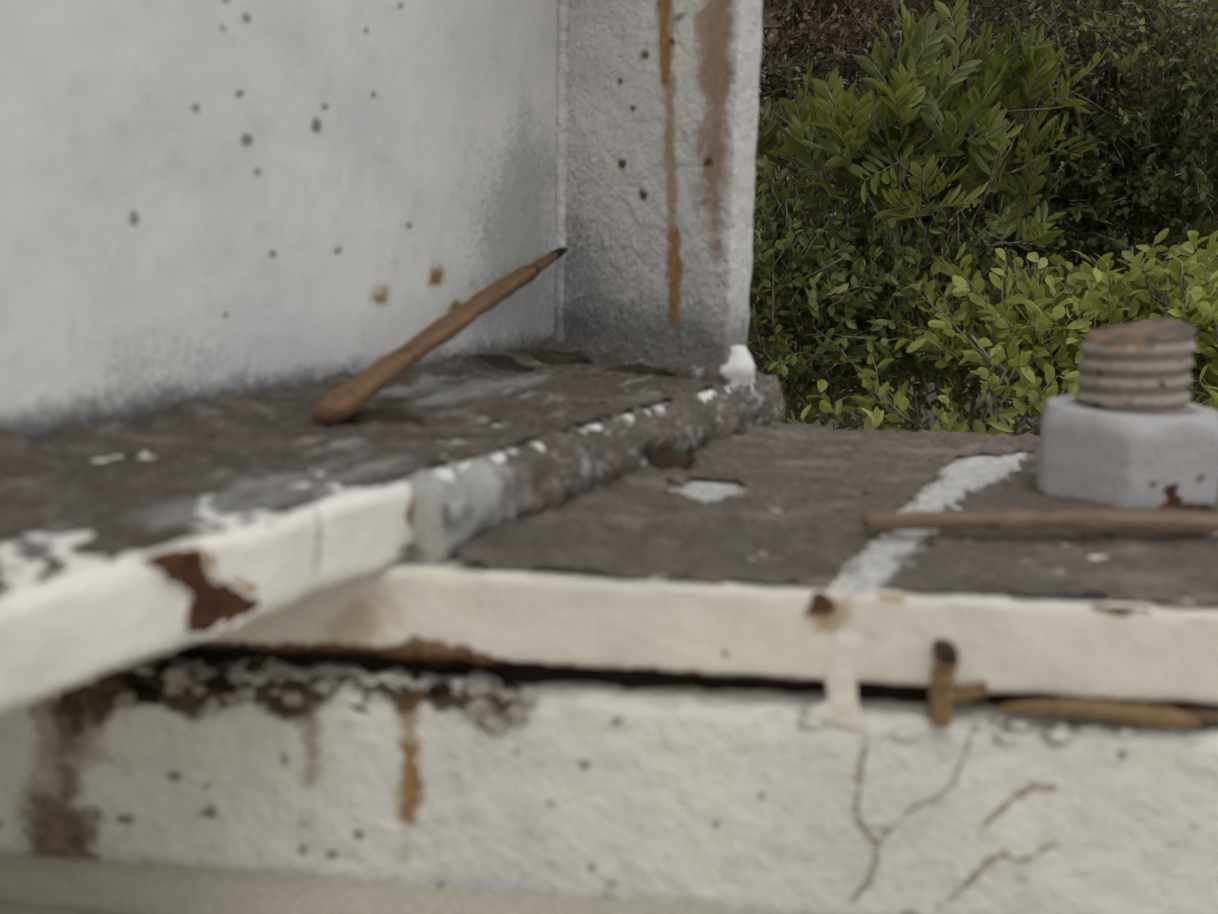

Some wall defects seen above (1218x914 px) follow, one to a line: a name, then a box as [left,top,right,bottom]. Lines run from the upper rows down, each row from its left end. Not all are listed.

corrosion [641,0,682,324]
spalling [46,657,537,735]
corrosion [394,683,429,822]
crack [851,735,891,902]
crack [963,843,1056,888]
crack [984,782,1056,826]